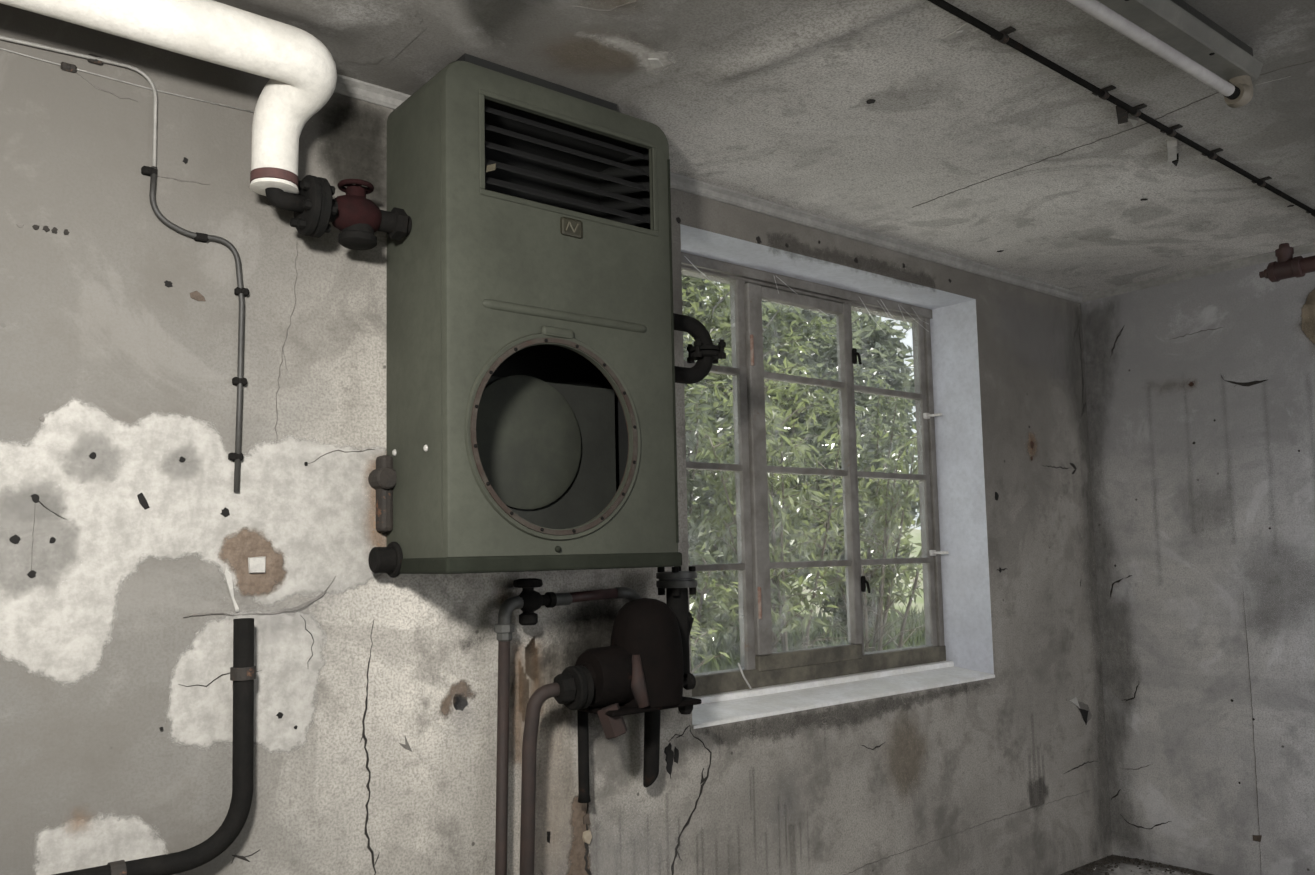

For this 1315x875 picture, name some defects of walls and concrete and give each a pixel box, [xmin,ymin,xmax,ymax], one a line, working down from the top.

peeling [1301,289,1315,344]
peeling [0,398,386,752]
peeling [35,814,167,875]
crack [360,621,380,875]
crack [399,736,412,752]
spalling [567,796,592,875]
crack [671,725,712,875]
crack [844,761,1172,875]